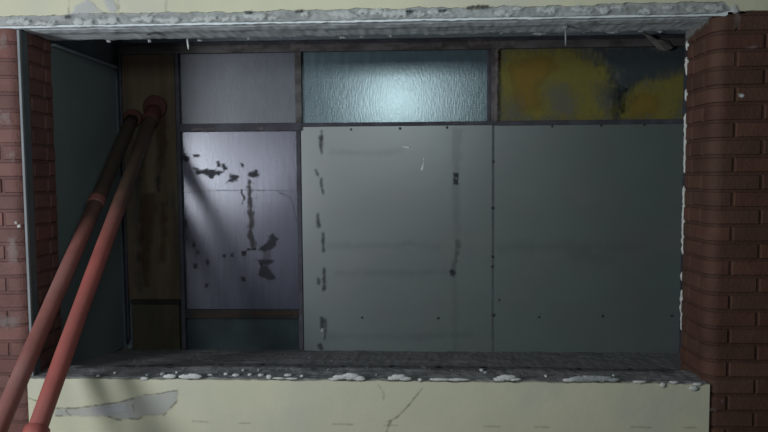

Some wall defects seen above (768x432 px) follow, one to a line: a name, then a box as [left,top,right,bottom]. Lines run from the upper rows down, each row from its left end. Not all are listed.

peeling [182,155,238,182]
peeling [258,233,278,280]
peeling [56,391,176,420]